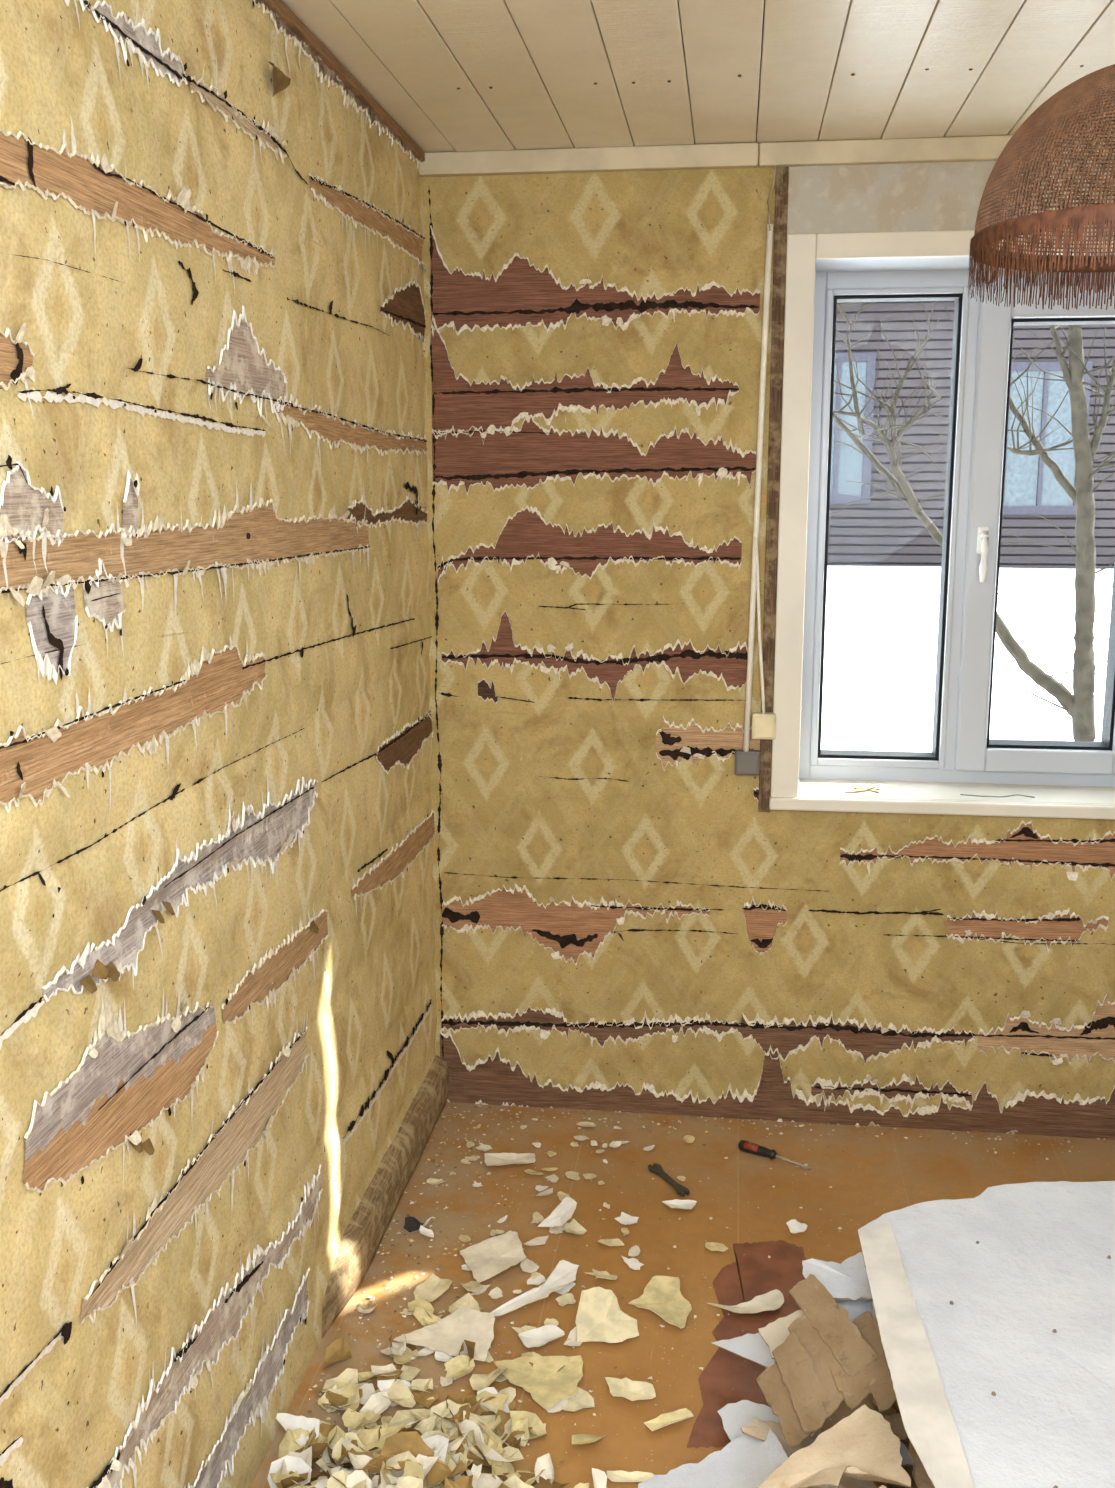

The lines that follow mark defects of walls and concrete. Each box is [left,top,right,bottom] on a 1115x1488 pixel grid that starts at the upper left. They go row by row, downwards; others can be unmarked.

peeling [176,186,192,208]
peeling [602,317,623,326]
peeling [480,425,510,439]
peeling [0,540,25,559]
peeling [548,557,570,570]
peeling [9,571,71,607]
peeling [540,642,573,673]
peeling [45,727,62,743]
peeling [152,901,175,923]
peeling [80,961,120,994]
peeling [170,1000,188,1033]
peeling [128,1130,155,1155]